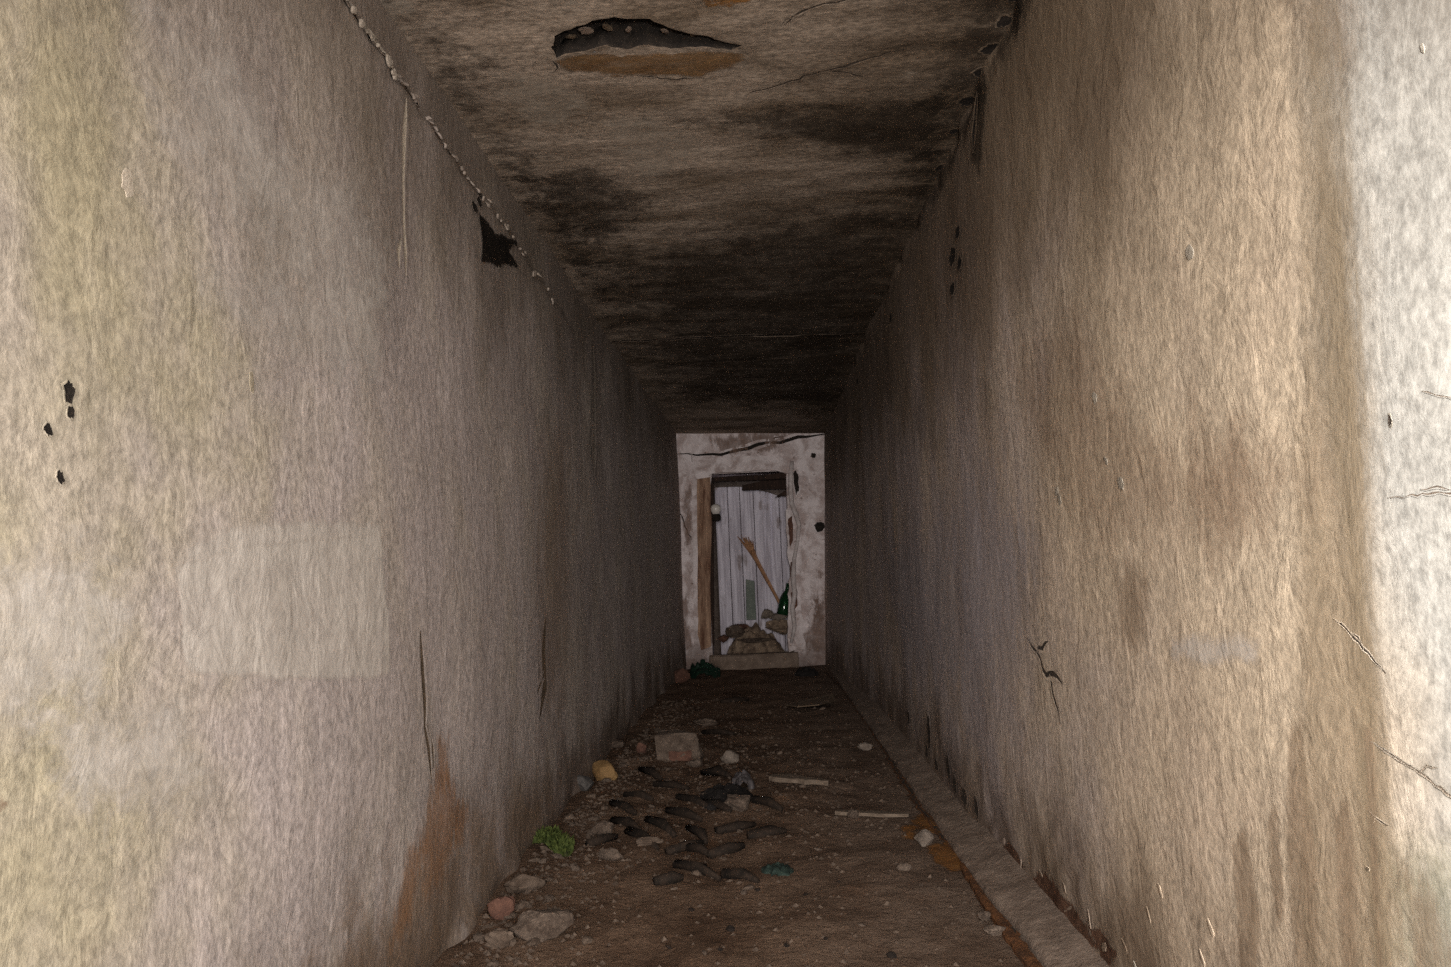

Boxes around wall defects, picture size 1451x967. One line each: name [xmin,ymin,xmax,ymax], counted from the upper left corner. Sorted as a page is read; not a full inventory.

hole [532,6,760,64]
flaking render [344,0,554,304]
water stain [633,218,893,406]
crack [1422,390,1451,399]
crack [1388,484,1451,499]
corrosion [902,814,1043,967]